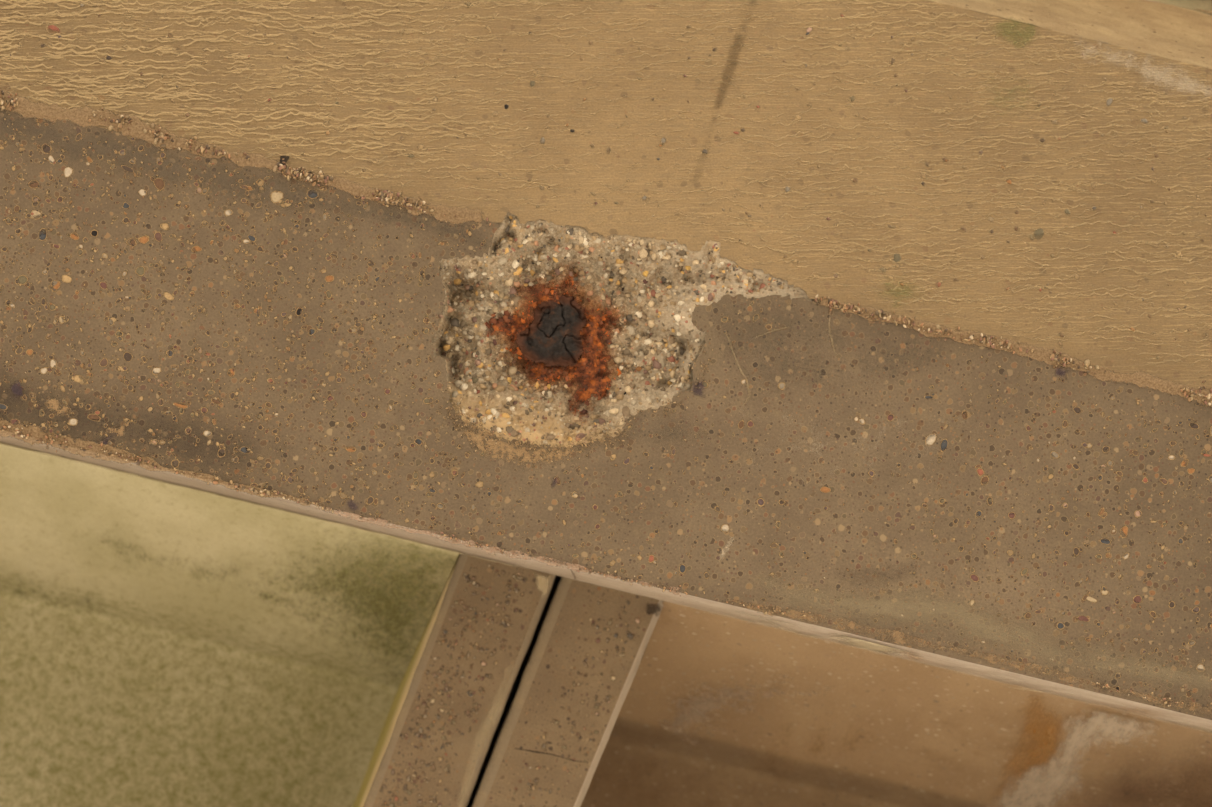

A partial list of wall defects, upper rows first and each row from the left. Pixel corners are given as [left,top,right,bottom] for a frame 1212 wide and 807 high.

corrosion [487,273,620,422]
spalling [0,89,1212,715]
leakage [999,711,1150,807]